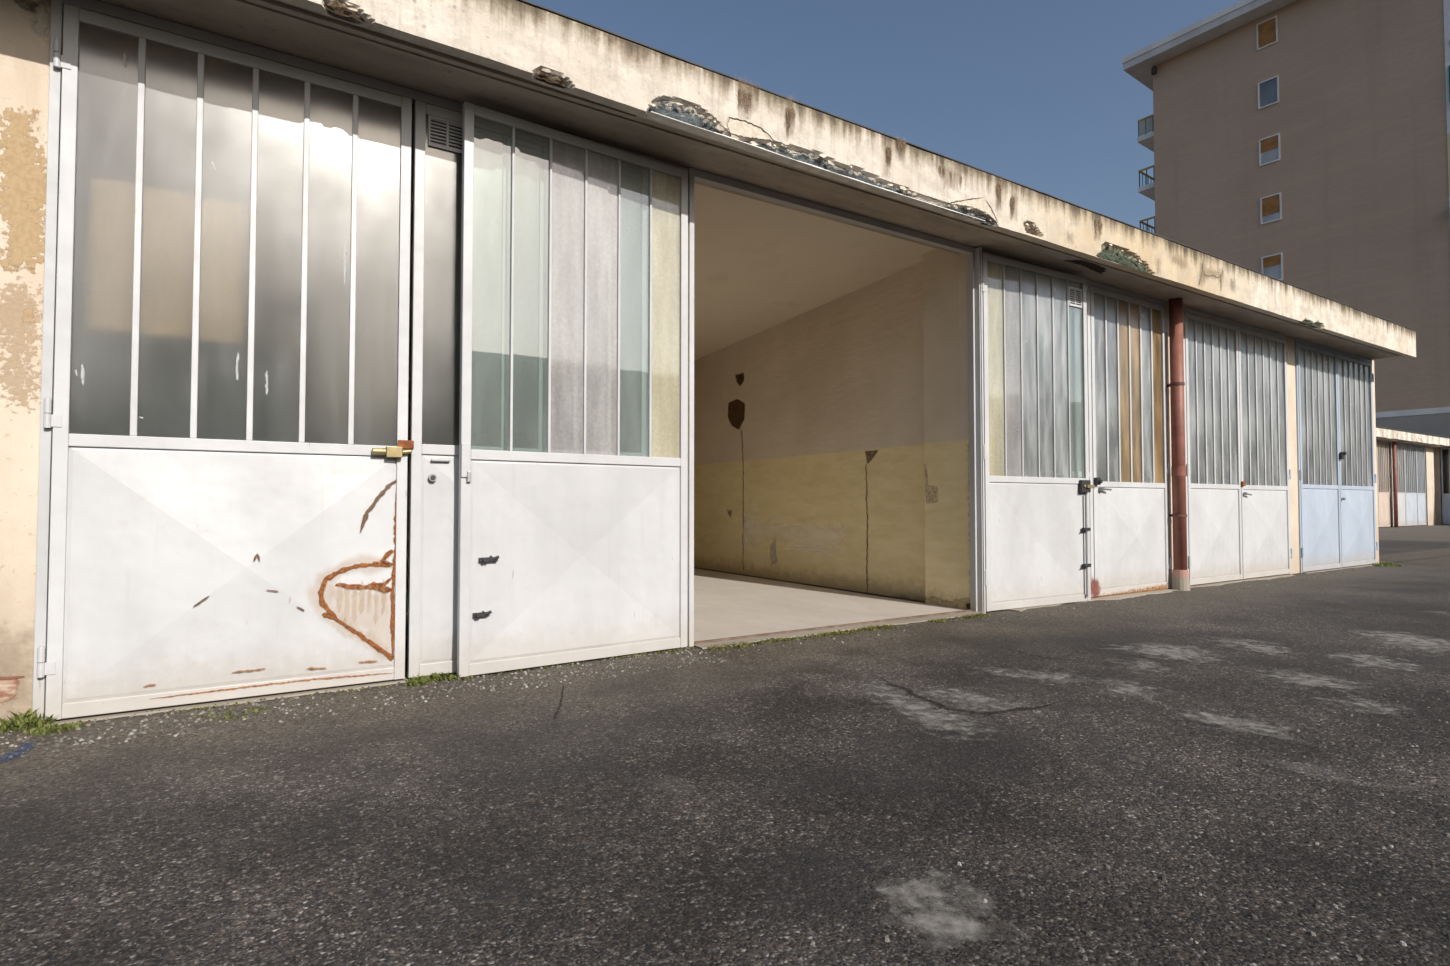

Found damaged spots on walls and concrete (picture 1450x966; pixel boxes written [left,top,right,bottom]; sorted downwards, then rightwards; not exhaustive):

spalling [324,0,367,23]
water stain [738,88,752,106]
spalling [646,95,998,226]
water stain [886,139,906,165]
water stain [996,184,1015,210]
peeling [0,105,47,420]
spalling [1065,244,1151,274]
corrosion [143,479,397,699]